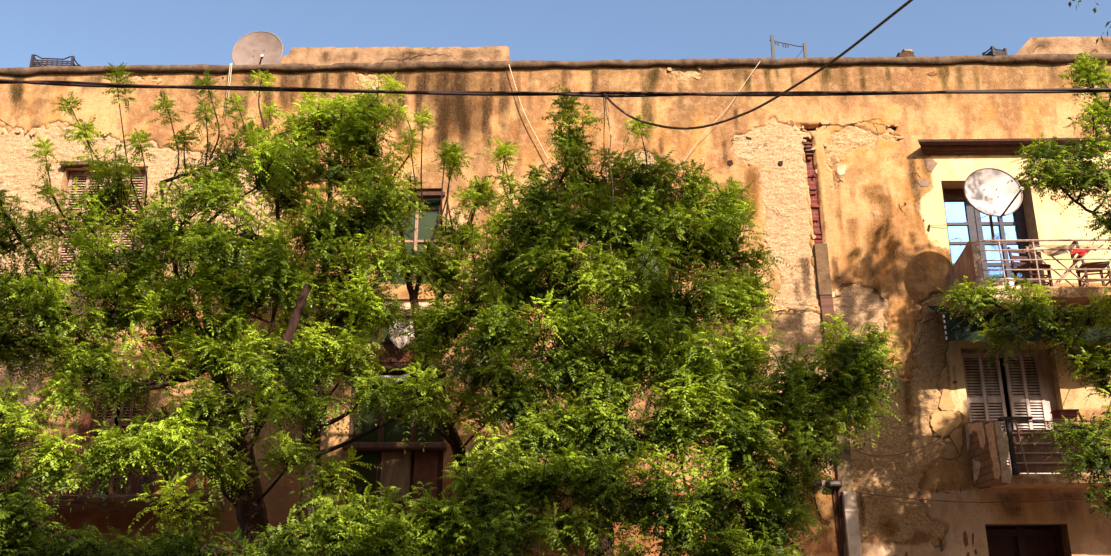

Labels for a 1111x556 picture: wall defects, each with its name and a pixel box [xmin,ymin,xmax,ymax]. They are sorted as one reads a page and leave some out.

damp [394,51,508,144]
damp [642,69,658,133]
spalling [0,121,286,281]
peeling [916,159,938,187]
spalling [56,251,198,347]
spalling [727,118,904,393]
spalling [0,315,49,424]
spalling [789,434,836,489]
spalling [850,293,966,556]